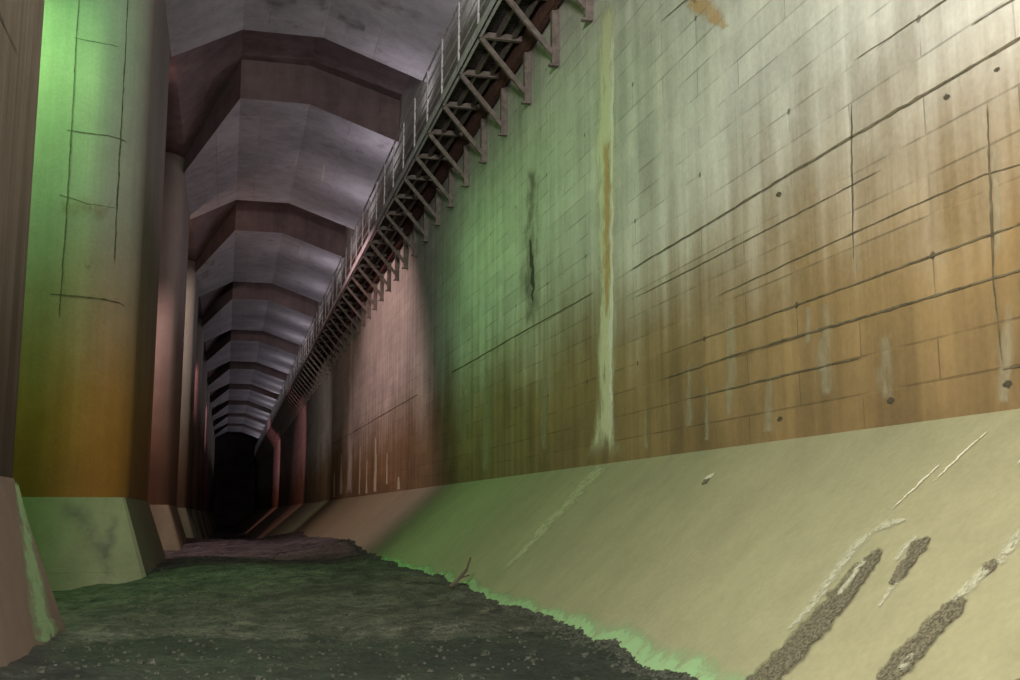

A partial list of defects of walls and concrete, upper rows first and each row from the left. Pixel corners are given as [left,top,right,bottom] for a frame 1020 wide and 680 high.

crack [51,0,128,316]
spalling [746,518,905,680]
spalling [876,532,1020,680]